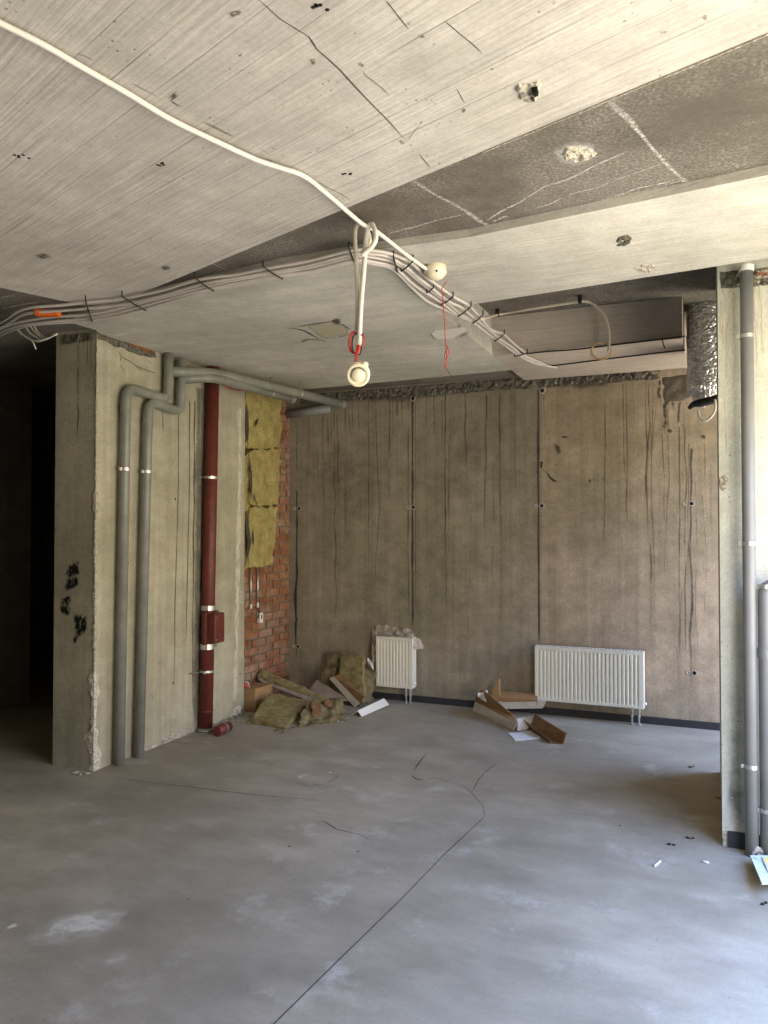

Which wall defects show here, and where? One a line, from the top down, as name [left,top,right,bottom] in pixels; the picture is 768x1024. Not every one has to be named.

crack [263,3,430,167]
spalling [515,80,541,103]
spalling [560,146,597,163]
spalling [84,344,101,771]
crack [412,752,494,811]